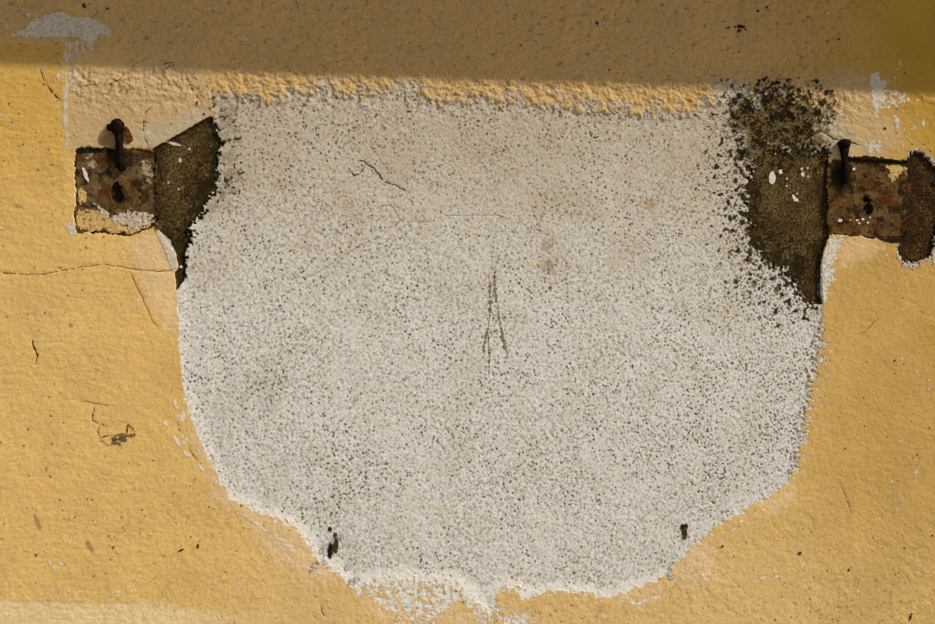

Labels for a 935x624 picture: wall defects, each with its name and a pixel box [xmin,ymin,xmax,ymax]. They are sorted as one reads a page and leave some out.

corrosion [89,127,155,168]
crack [3,264,172,325]
peeling [152,56,845,624]